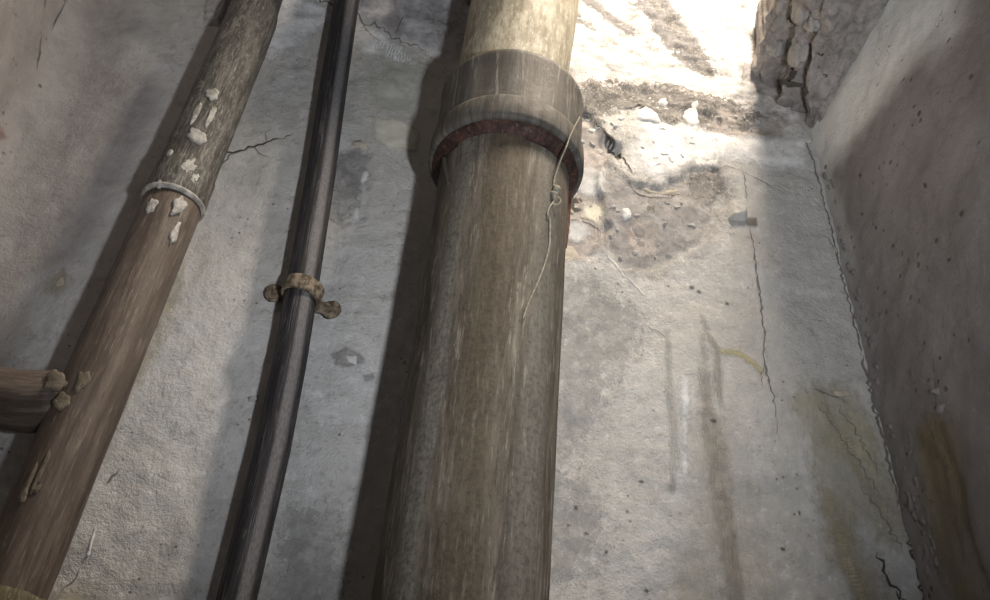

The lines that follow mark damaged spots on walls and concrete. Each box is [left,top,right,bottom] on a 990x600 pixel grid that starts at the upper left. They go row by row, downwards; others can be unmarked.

peeling [550,75,810,583]
crack [718,165,787,202]
crack [750,229,780,440]
crack [805,142,939,600]